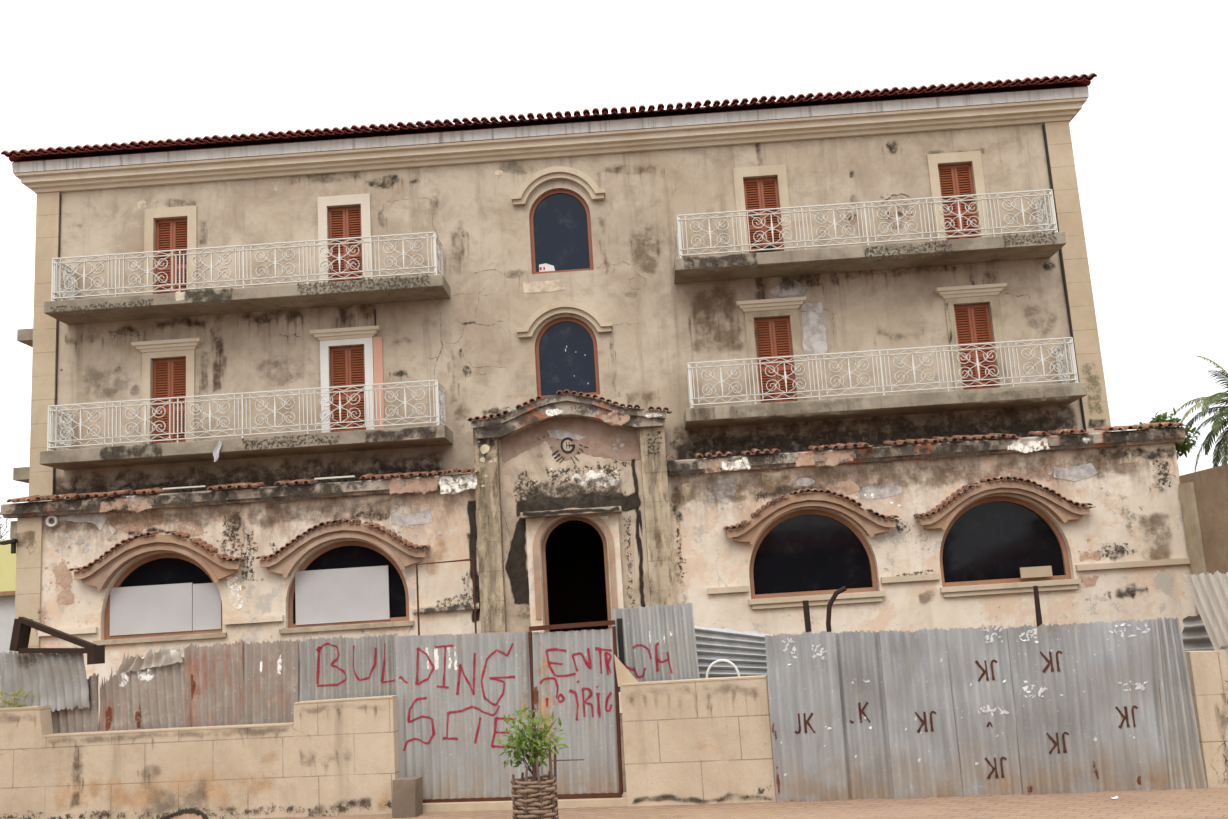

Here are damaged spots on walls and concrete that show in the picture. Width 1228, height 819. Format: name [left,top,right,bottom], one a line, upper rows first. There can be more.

water stain [682,252,765,299]
water stain [694,288,742,349]
water stain [202,338,223,390]
peeling [388,409,640,494]
water stain [505,366,1181,618]
peeling [391,509,443,538]
peeling [225,574,245,609]
water stain [4,786,370,819]